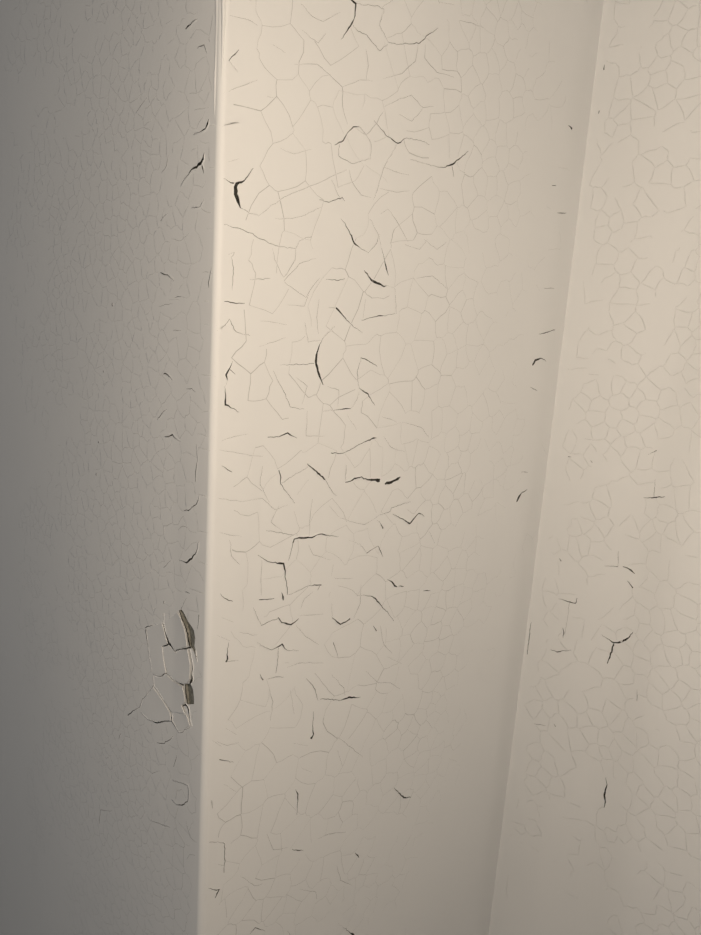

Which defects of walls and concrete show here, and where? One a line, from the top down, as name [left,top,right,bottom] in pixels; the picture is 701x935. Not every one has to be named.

crack [157,0,592,935]
crack [605,551,635,588]
peeling [140,611,197,733]
crack [151,736,190,828]
crack [601,778,609,808]